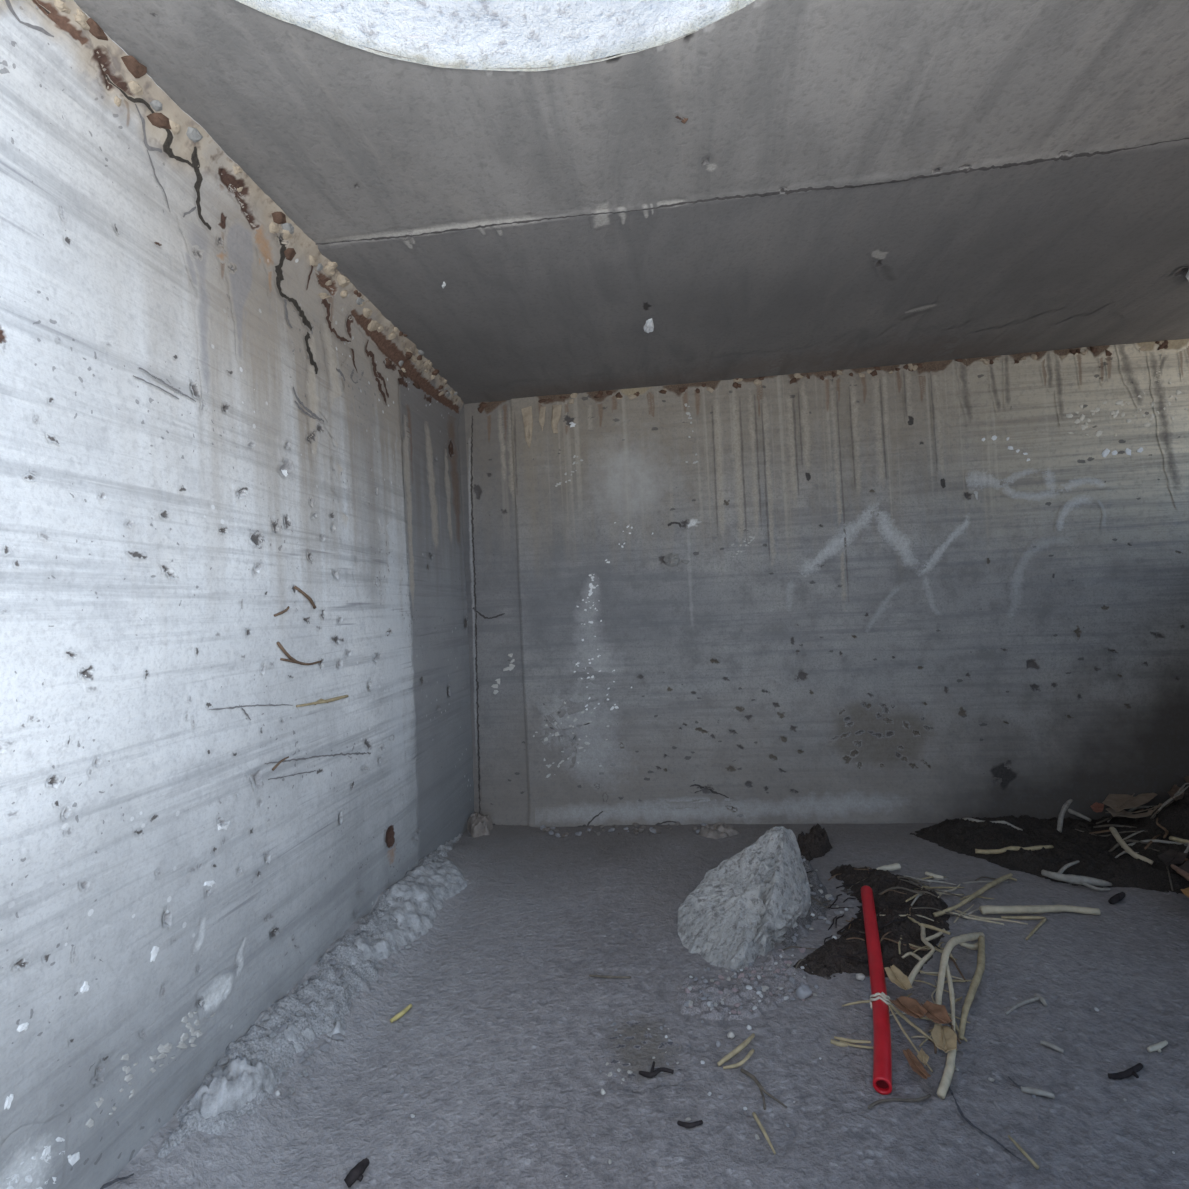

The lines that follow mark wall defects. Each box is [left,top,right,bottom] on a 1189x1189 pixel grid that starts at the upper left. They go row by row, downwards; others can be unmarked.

crack [3,0,54,38]
crack [105,74,212,231]
corrosion [215,210,229,285]
corrosion [250,219,277,298]
damp [711,381,813,587]
corrosion [474,302,1124,447]
damp [828,372,889,632]
damp [1044,344,1189,509]
corrosion [1134,339,1189,382]
damp [528,573,958,827]
damp [119,937,247,1098]
damp [0,1113,80,1189]